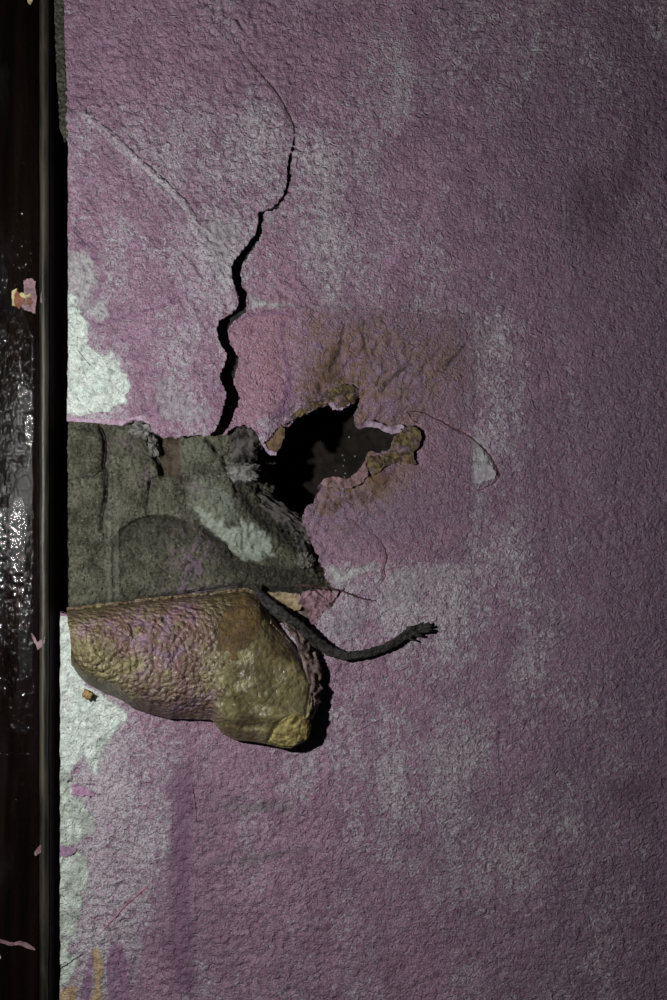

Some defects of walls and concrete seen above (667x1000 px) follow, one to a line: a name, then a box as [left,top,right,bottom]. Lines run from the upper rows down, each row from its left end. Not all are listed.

crack [217,43,295,428]
flaking render [60,243,422,986]